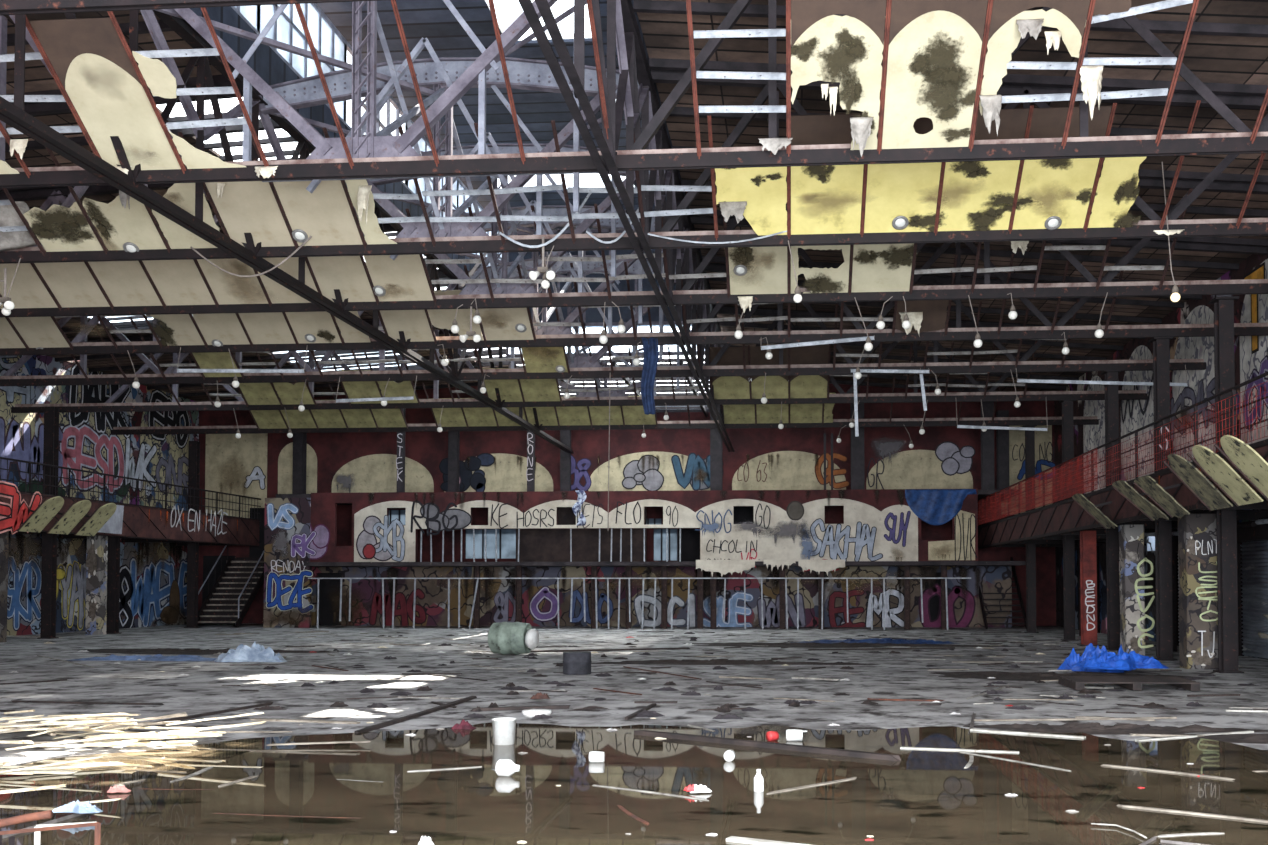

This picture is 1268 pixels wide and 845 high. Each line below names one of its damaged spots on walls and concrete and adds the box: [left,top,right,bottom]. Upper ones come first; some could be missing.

water stain [791,29,875,133]
water stain [910,35,976,142]
water stain [952,161,988,178]
water stain [1041,159,1071,169]
water stain [31,198,116,243]
water stain [909,212,943,232]
water stain [967,194,1033,231]
water stain [1076,189,1097,204]
water stain [1114,175,1141,228]